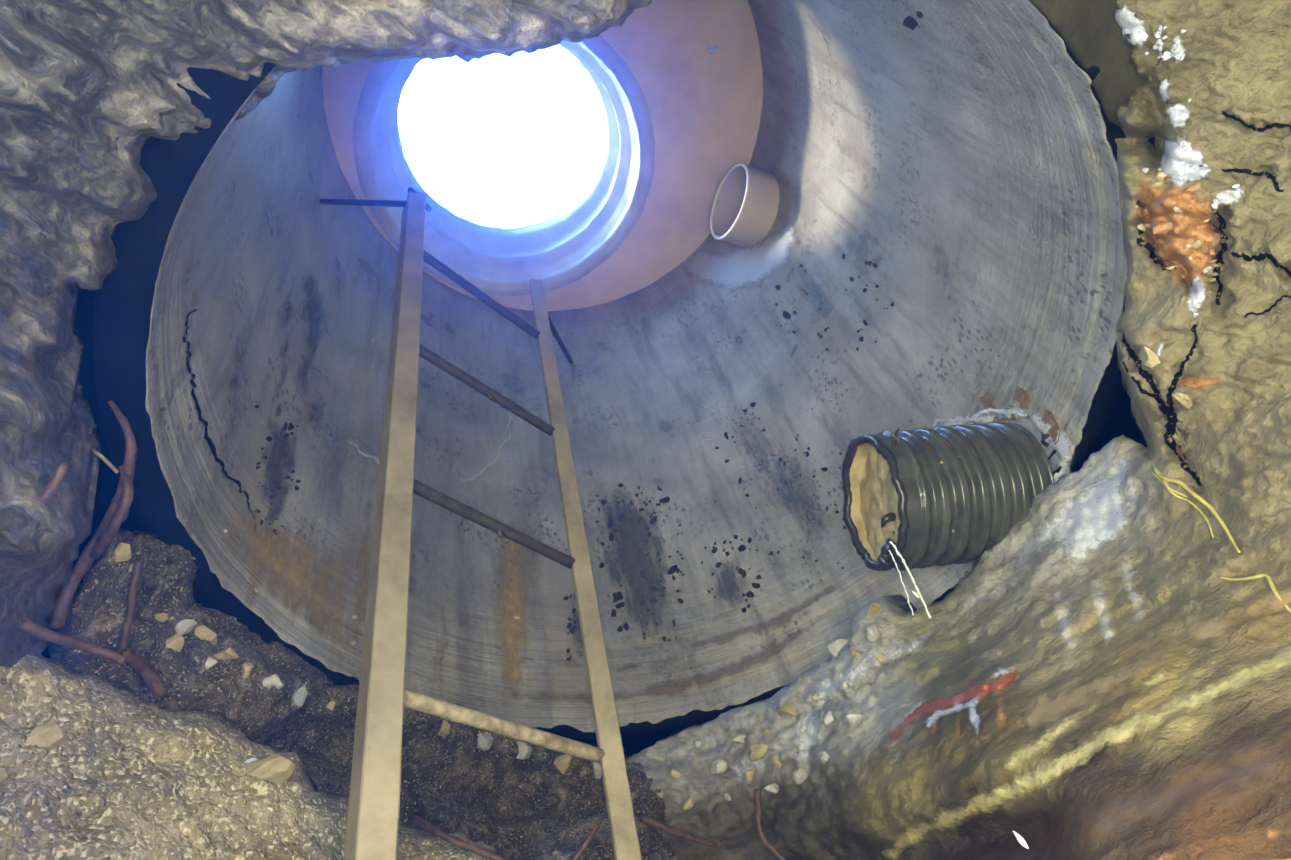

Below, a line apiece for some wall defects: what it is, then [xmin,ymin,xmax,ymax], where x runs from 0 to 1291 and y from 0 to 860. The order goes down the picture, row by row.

crack [182,309,256,531]